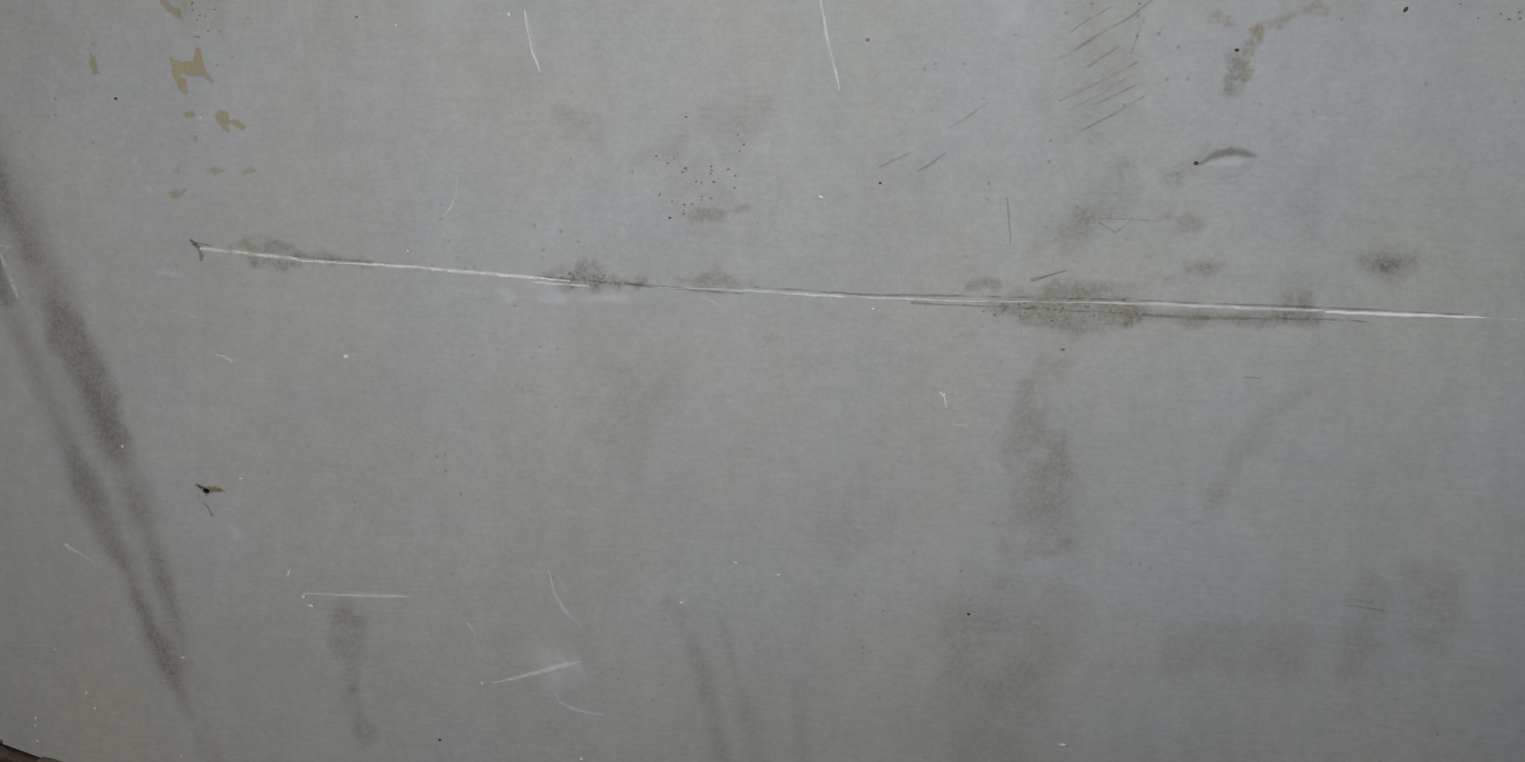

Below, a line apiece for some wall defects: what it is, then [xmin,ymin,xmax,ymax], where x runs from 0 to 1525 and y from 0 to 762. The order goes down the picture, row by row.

peeling [161,0,220,92]
crack [200,247,587,287]
crack [659,287,1029,303]
crack [1068,302,1485,319]